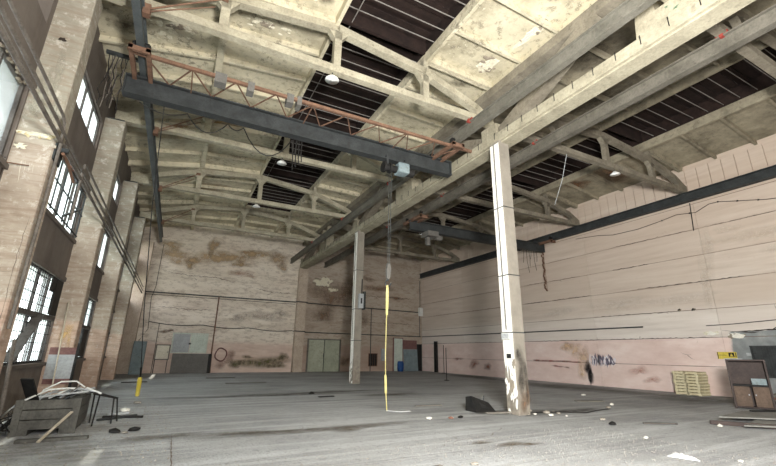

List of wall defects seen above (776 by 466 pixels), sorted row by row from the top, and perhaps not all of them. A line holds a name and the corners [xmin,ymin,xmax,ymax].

leakage [165,241,286,270]
peeling [312,277,338,293]
spalling [505,359,518,414]
leakage [535,360,592,389]